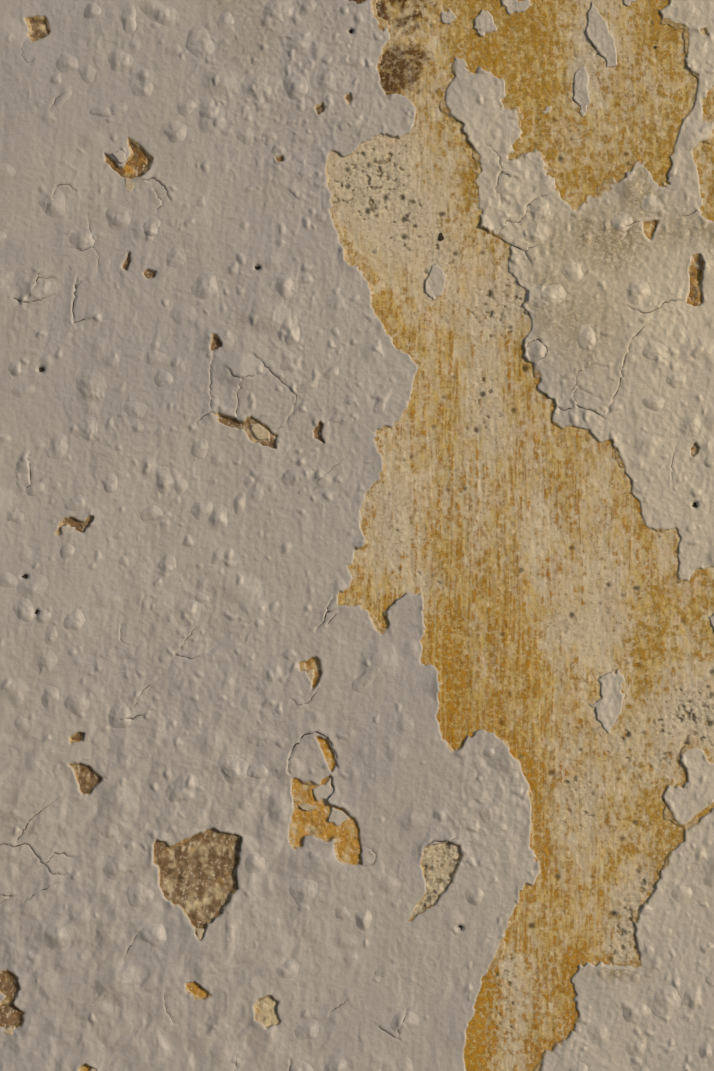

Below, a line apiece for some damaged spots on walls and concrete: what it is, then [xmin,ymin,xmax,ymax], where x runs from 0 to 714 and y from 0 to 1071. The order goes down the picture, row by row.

peeling [105,142,150,193]
crack [197,356,297,430]
crack [554,300,684,418]
peeling [219,416,276,448]
peeling [313,423,324,443]
peeling [61,517,93,535]
peeling [327,0,714,1071]
peeling [70,763,102,794]
spalling [289,737,362,865]
crack [3,799,67,902]
spalling [154,828,242,940]
peeling [0,972,22,1035]